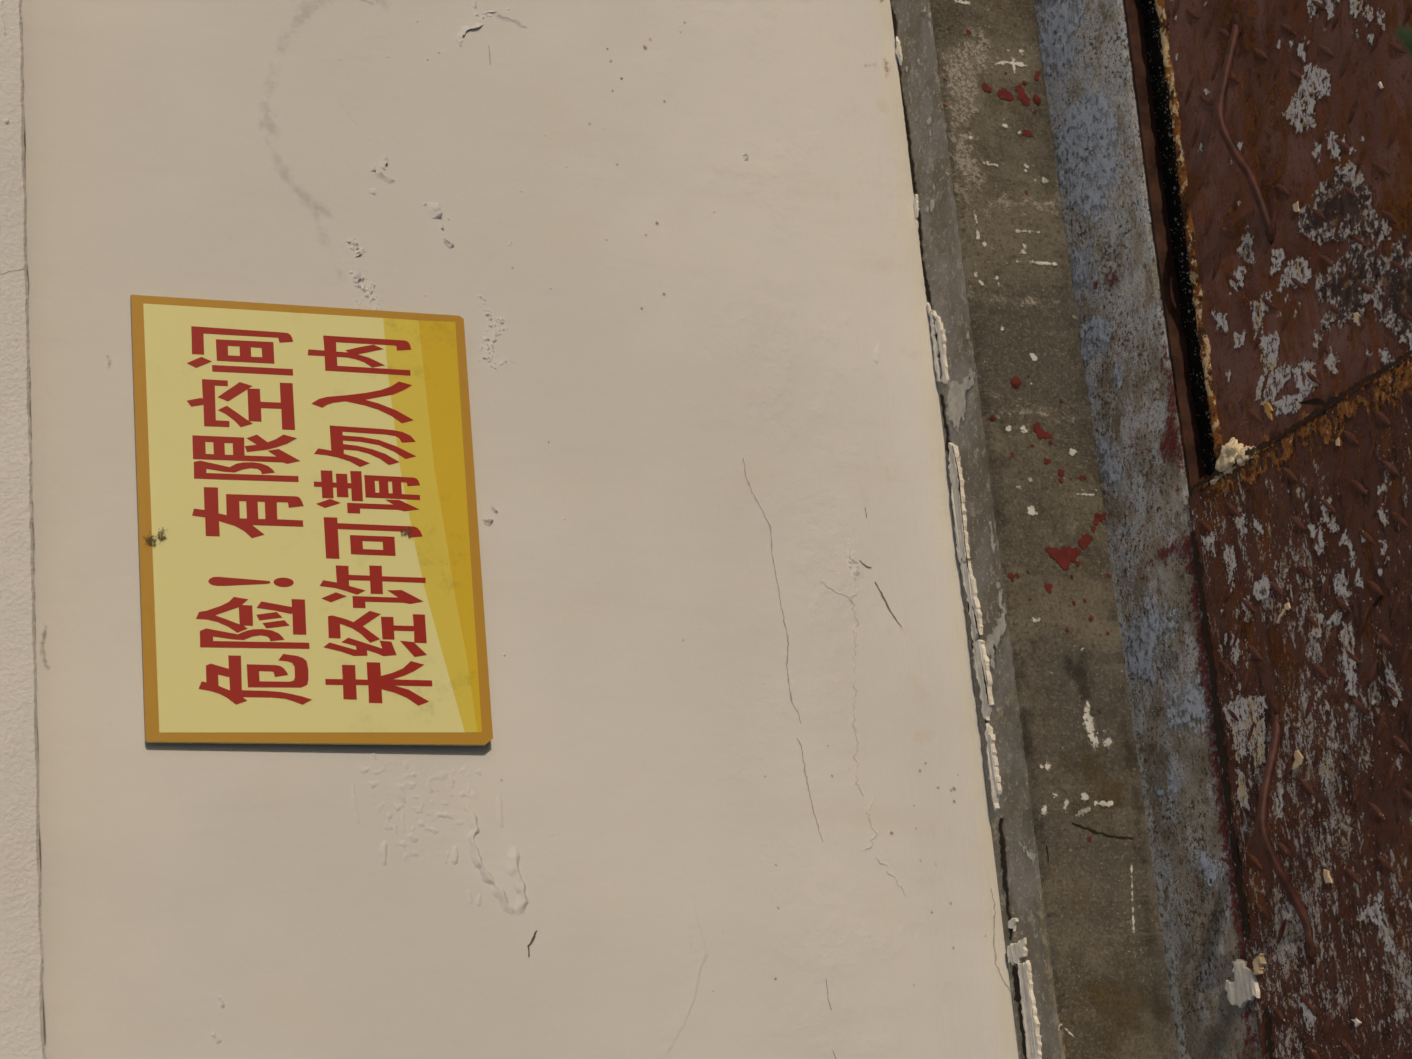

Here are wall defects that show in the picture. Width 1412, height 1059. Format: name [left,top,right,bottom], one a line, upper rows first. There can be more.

spalling [346,238,384,311]
spalling [423,202,454,249]
spalling [476,291,515,371]
peeling [1038,0,1123,393]
rust [1155,0,1222,459]
peeling [1095,427,1125,499]
rust [1196,348,1412,511]
peeling [927,302,1002,811]
peeling [1108,547,1210,1059]
peeling [1189,848,1230,894]
peeling [1007,918,1042,1059]